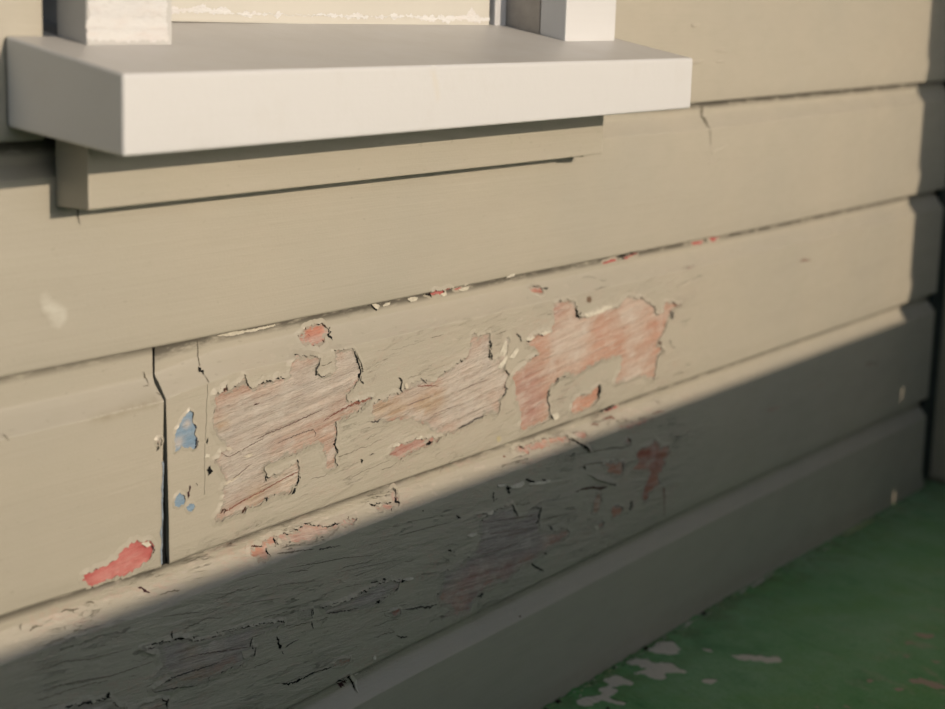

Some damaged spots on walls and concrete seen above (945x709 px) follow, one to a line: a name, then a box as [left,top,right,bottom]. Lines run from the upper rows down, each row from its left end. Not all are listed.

peeling [154,283,683,527]
peeling [78,535,157,589]
peeling [245,512,360,568]
peeling [52,615,287,709]
spalling [570,639,788,709]